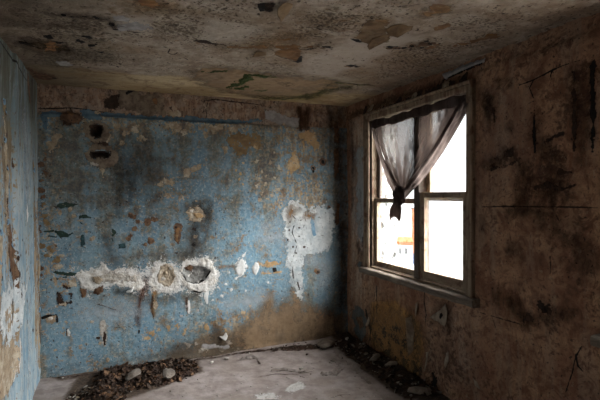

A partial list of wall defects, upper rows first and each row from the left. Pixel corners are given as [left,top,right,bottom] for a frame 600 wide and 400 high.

flaking render [40,90,320,185]
damp [190,66,338,97]
peeling [351,18,413,50]
crack [519,60,579,98]
damp [532,59,597,158]
flaking render [0,98,30,400]
peeling [22,133,73,238]
flaking render [154,177,206,246]
flaking render [255,170,338,301]
flaking render [32,243,252,352]
damp [161,290,340,360]
crack [566,346,583,391]